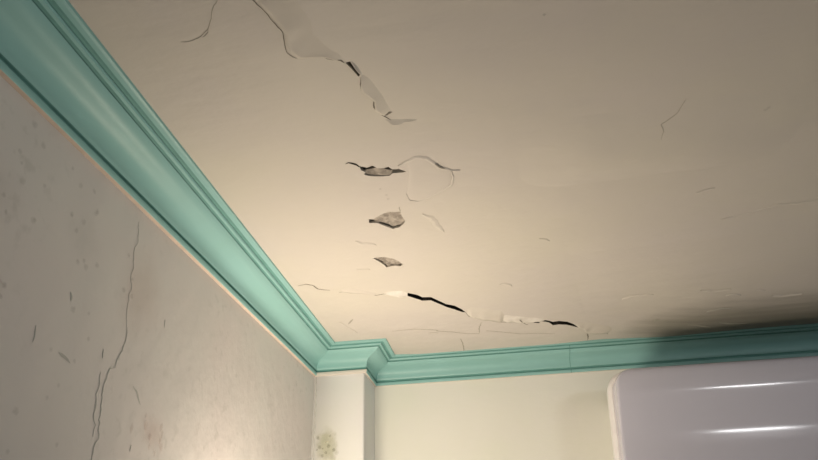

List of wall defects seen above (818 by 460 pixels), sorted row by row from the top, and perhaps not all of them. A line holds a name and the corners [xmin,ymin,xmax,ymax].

crack [253,0,417,126]
spalling [346,162,405,177]
spalling [369,207,405,229]
spalling [373,257,403,267]
crack [91,224,139,460]
crack [299,284,612,373]